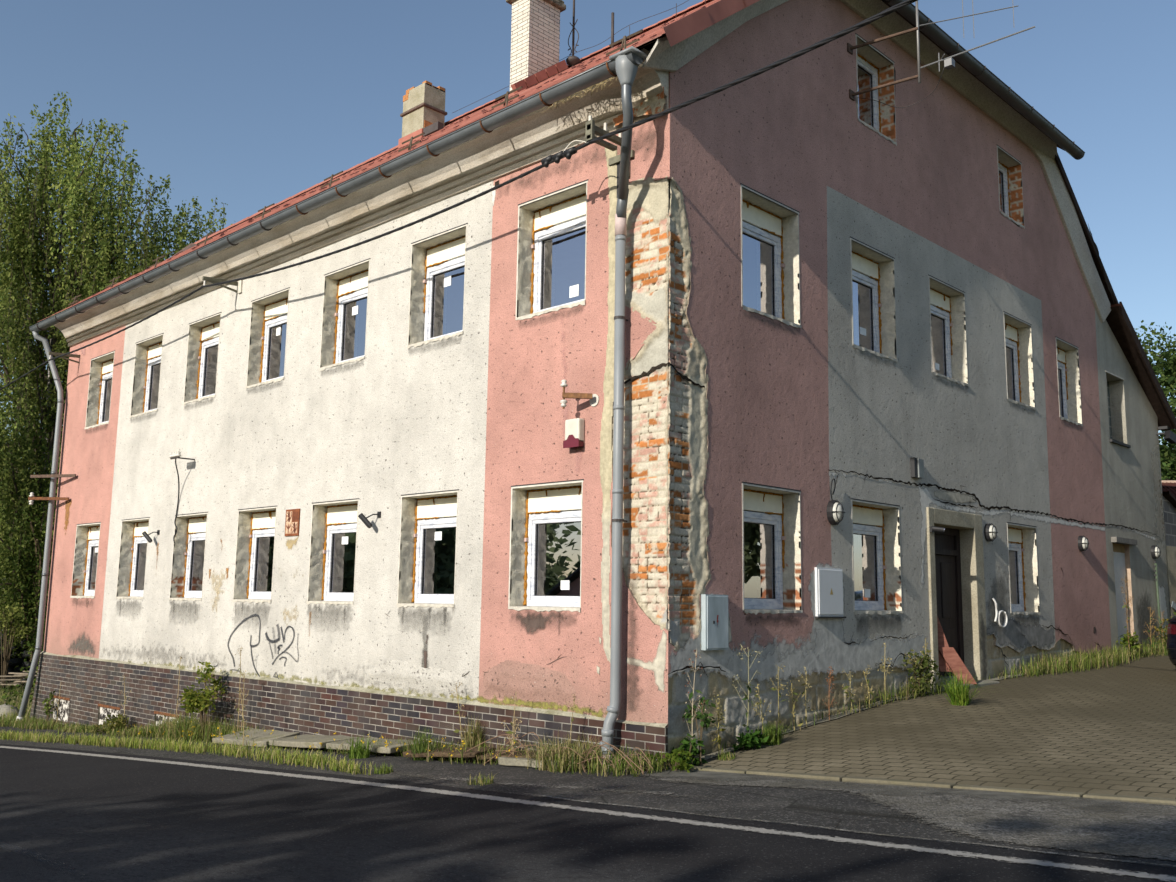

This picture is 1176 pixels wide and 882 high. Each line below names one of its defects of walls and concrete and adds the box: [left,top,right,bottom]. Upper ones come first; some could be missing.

flaking render [610,176,712,651]
crack [829,469,1160,538]
water stain [518,614,563,634]
flaking render [668,664,930,764]